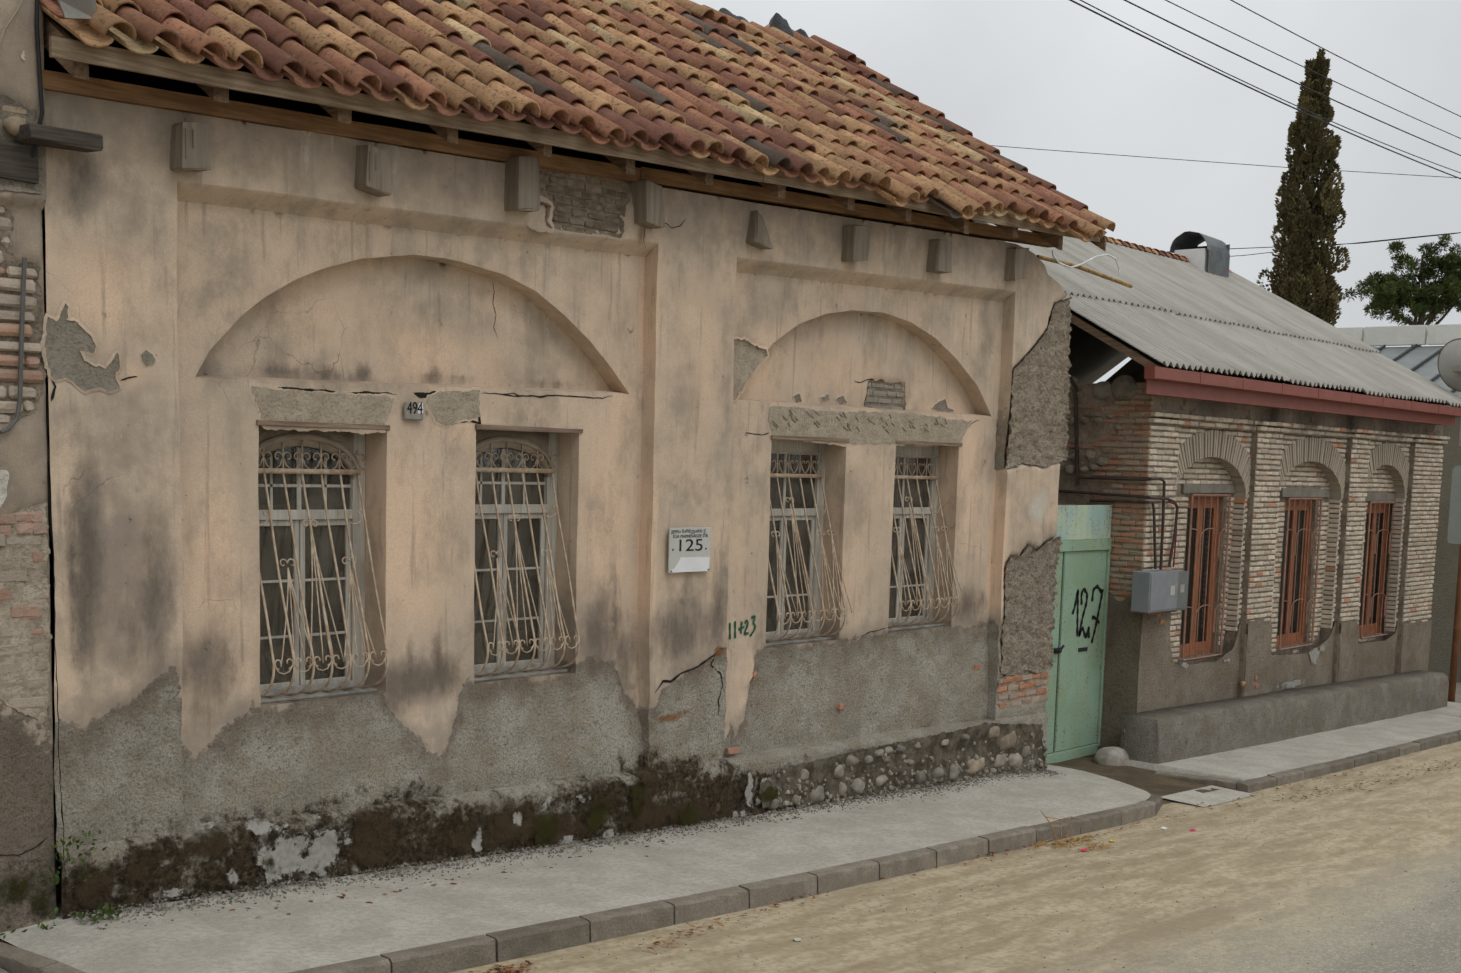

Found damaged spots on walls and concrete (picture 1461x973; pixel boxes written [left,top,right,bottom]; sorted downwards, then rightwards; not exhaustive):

flaking render [524,168,632,238]
flaking render [0,94,122,424]
flaking render [140,349,157,368]
flaking render [1005,297,1072,469]
crack [654,648,725,713]
spalling [759,536,1062,813]
leakage [345,805,397,867]
leakage [440,764,745,853]